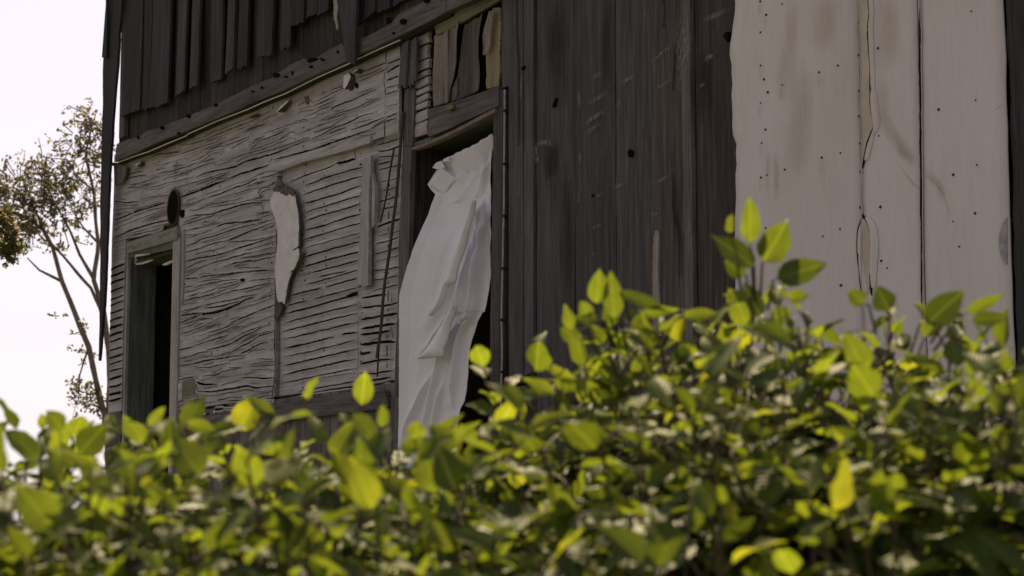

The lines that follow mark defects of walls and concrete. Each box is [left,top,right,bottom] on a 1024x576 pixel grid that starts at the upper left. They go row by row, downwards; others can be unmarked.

crack [856,0,864,332]
spalling [273,181,296,197]
peeling [288,248,302,272]